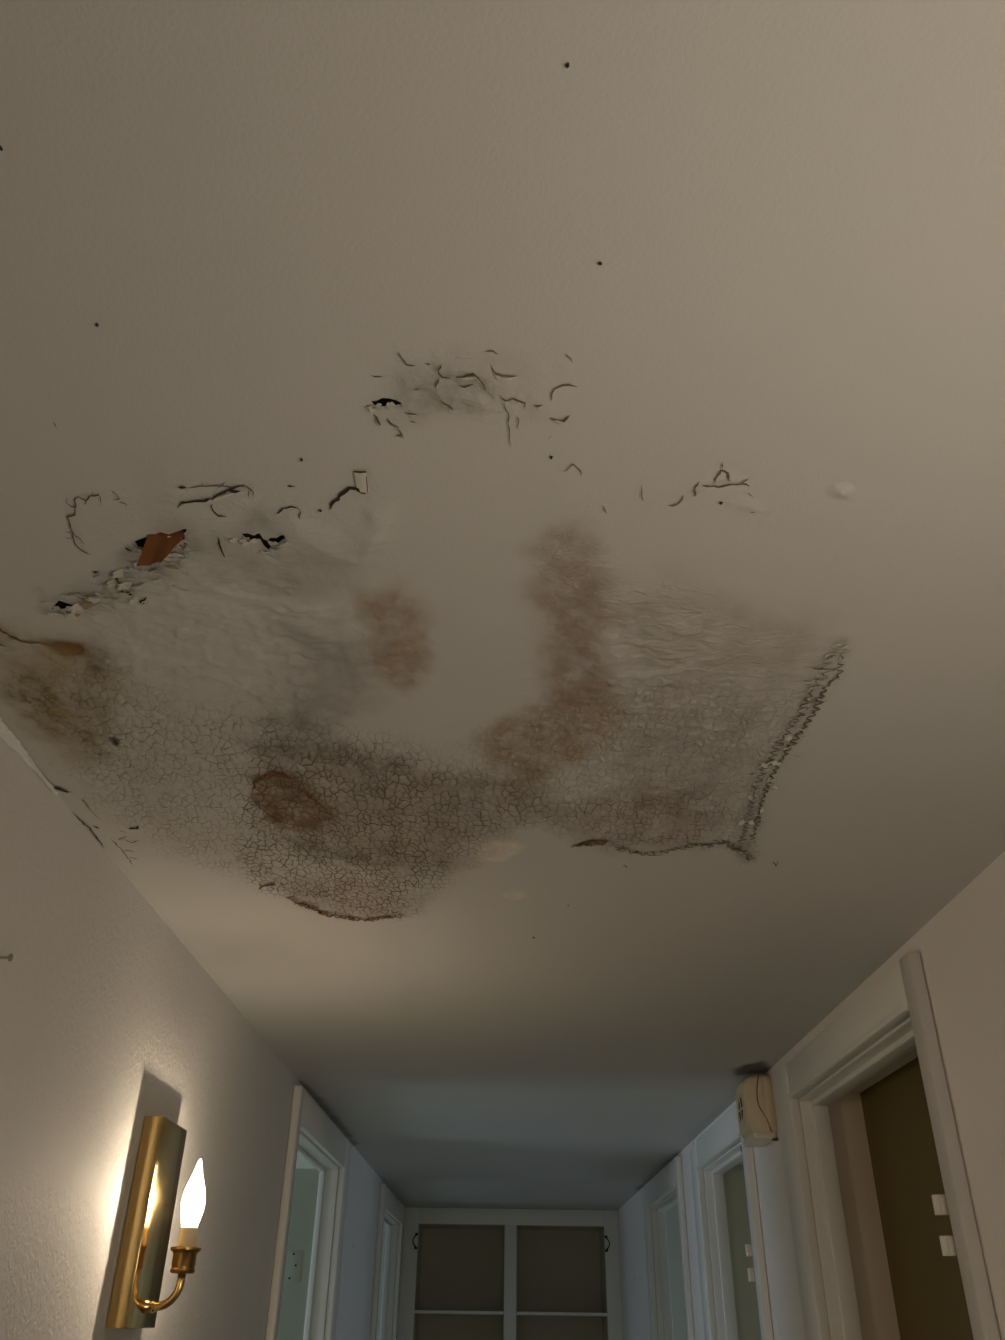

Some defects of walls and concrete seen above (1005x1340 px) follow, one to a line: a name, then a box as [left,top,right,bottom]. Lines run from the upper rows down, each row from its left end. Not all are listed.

crack [65,491,147,604]
peeling [32,536,190,620]
peeling [229,537,290,554]
crack [0,627,49,647]
crack [54,787,139,865]
crack [224,738,546,922]
crack [577,799,778,868]